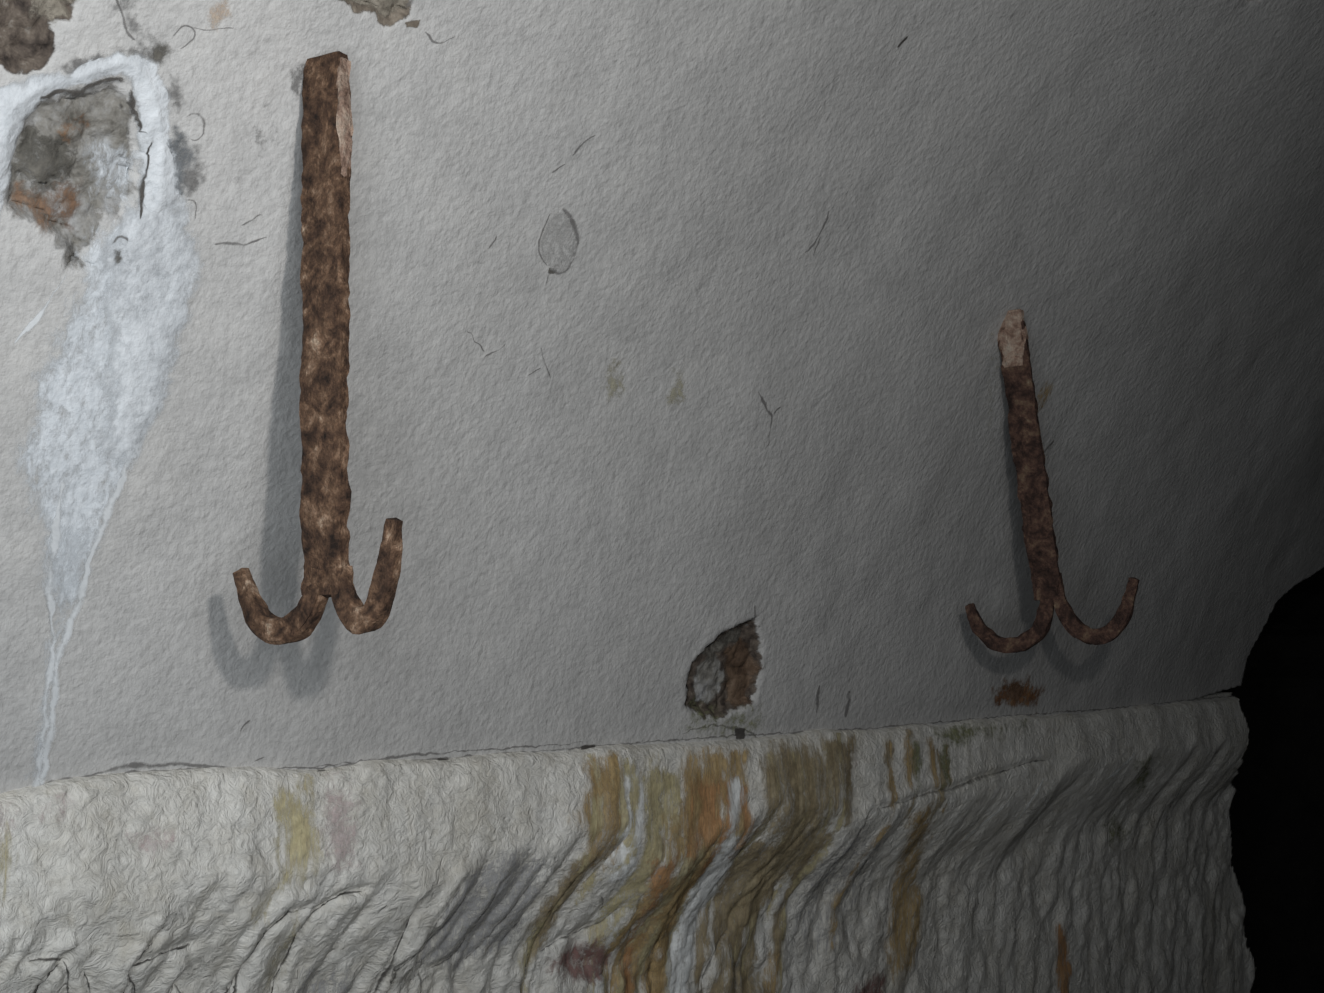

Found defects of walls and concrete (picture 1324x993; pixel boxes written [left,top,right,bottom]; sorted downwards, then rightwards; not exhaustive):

peeling [0,0,74,74]
water stain [148,44,169,62]
peeling [342,0,455,44]
spalling [6,84,135,266]
water stain [170,126,194,194]
water stain [185,164,200,195]
spalling [684,612,762,739]
corrosion [520,733,858,993]
corrosion [874,729,951,975]
crack [30,958,90,993]
crack [224,891,362,993]
crack [375,894,521,993]